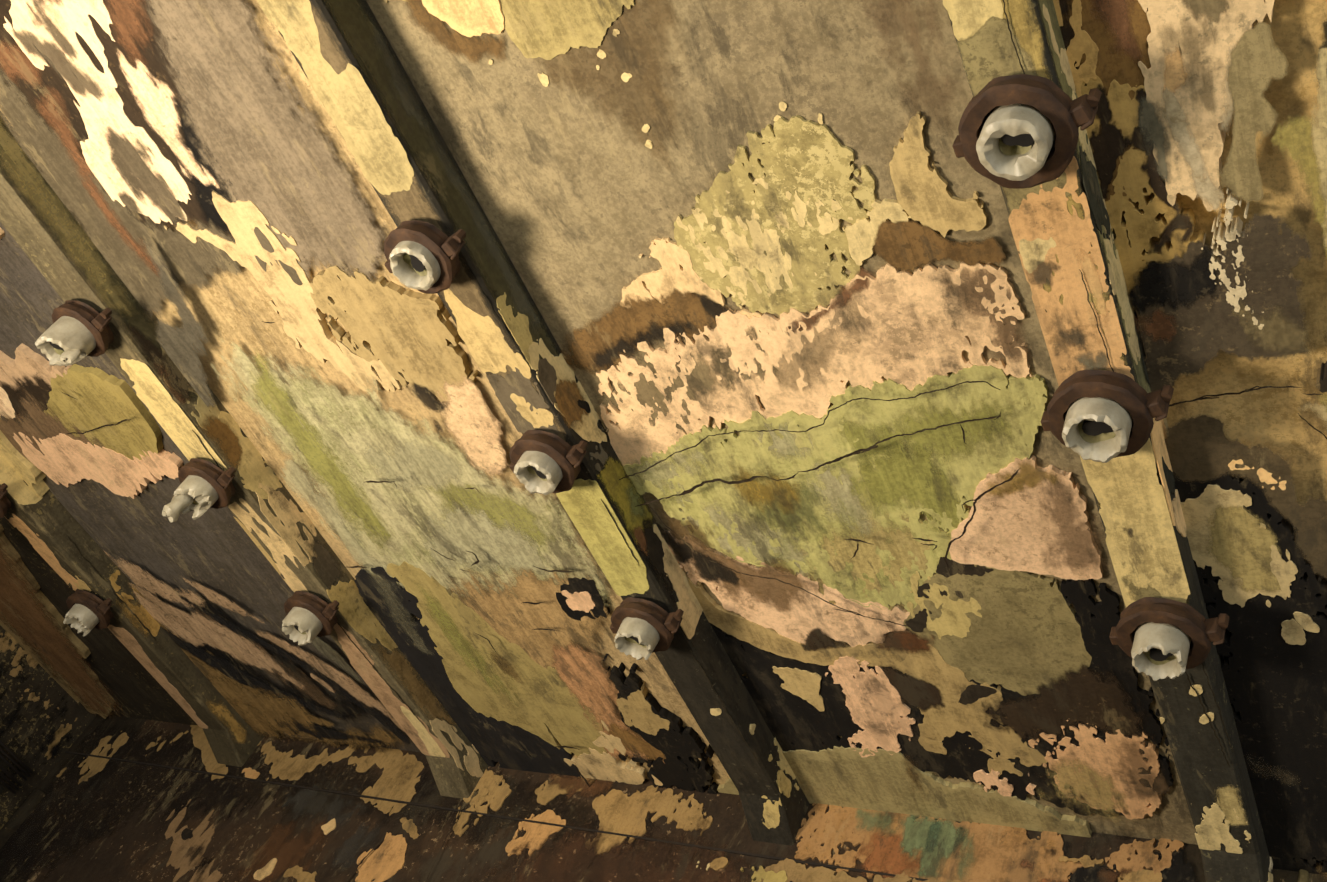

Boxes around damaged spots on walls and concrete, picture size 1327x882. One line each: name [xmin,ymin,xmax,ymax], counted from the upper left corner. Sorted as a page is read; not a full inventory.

crack [465,264,529,363]
spalling [0,0,1032,882]
crack [601,381,1001,626]
crack [913,469,1019,572]
peeling [653,418,1320,820]
spalling [1008,0,1275,386]
crack [1169,386,1327,439]
peeling [757,786,1251,882]